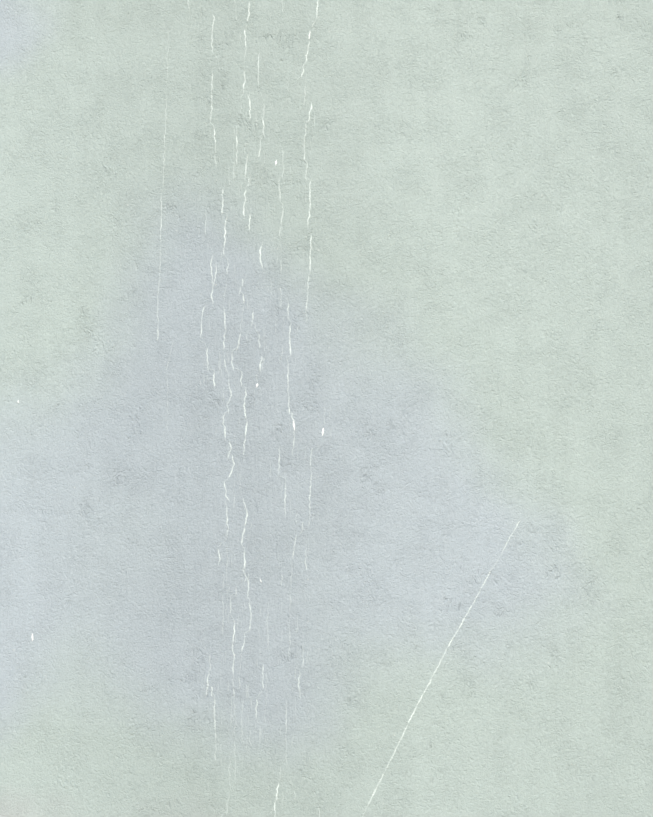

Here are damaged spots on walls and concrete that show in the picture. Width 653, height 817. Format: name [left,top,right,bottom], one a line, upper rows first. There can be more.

crack [157,27,174,433]
crack [196,0,332,817]